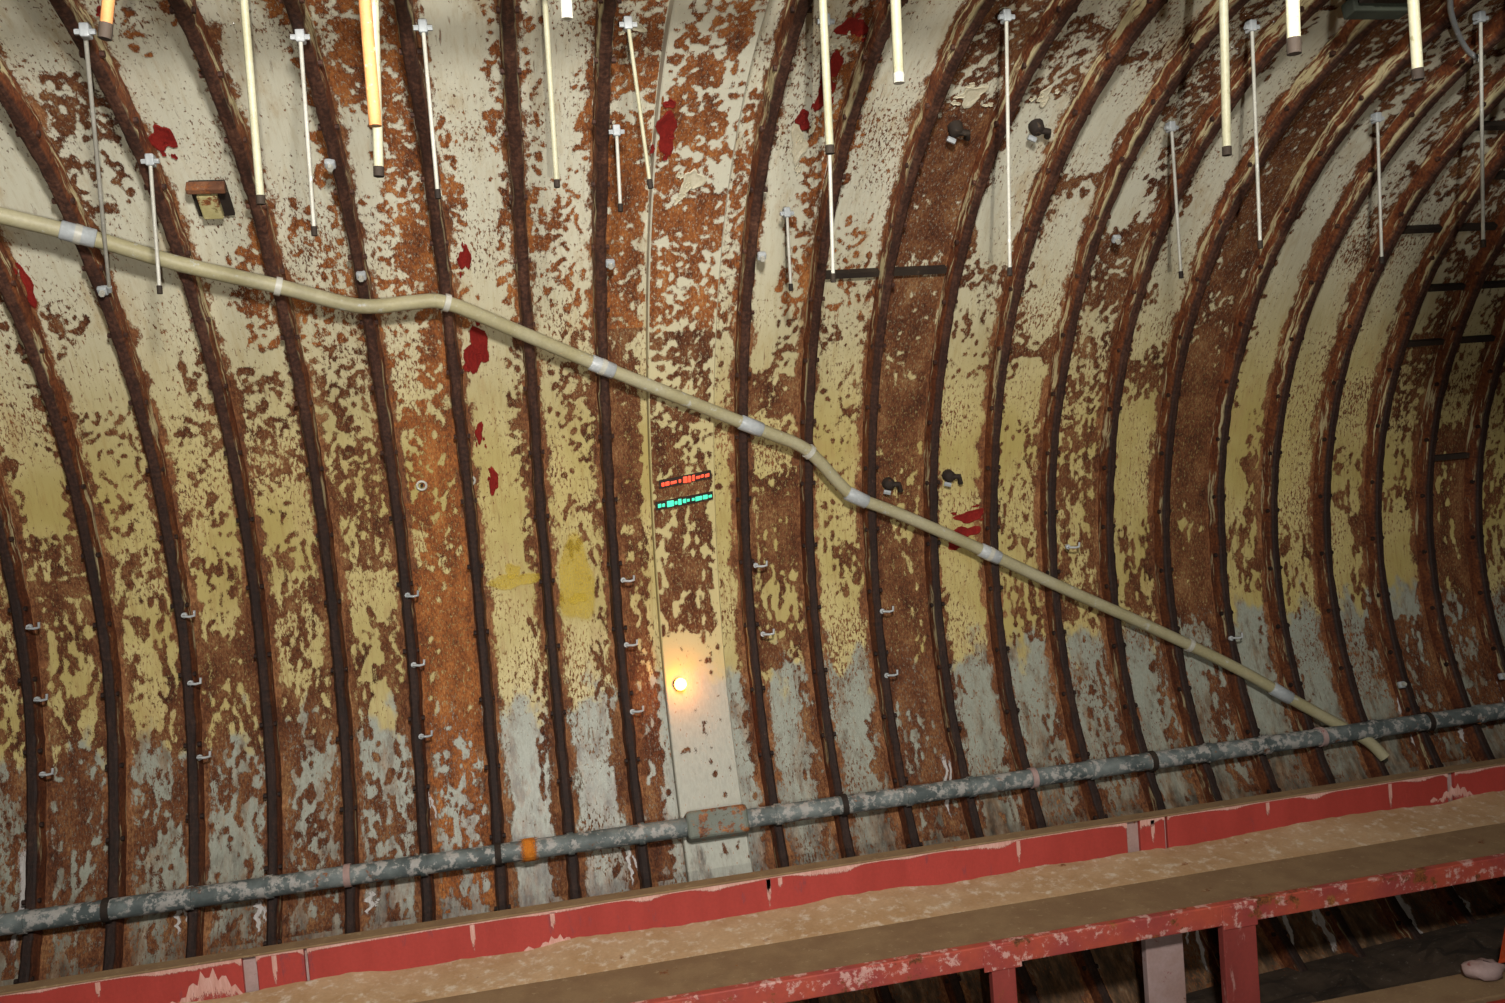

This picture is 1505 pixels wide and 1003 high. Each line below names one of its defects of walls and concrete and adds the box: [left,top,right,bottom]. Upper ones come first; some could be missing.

corrosion [38,71,136,219]
peeling [148,124,178,160]
corrosion [1367,47,1505,229]
peeling [13,262,37,309]
corrosion [39,303,91,360]
corrosion [69,0,491,896]
corrosion [478,0,1441,835]
corrosion [1332,247,1505,763]
corrosion [1382,164,1505,514]
corrosion [0,445,109,914]
corrosion [206,887,345,949]
corrosion [363,866,495,924]